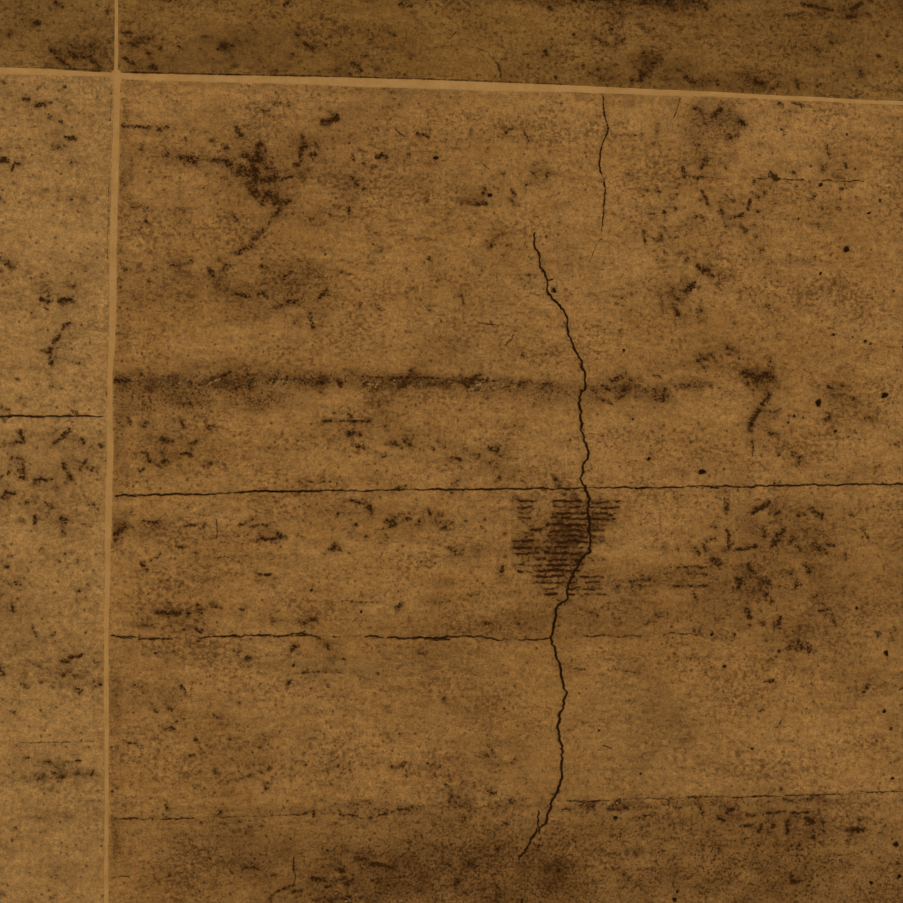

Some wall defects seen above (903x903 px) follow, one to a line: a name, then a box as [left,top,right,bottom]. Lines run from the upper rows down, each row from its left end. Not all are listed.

crack [589,97,609,261]
crack [519,221,592,860]
damp [497,475,849,663]